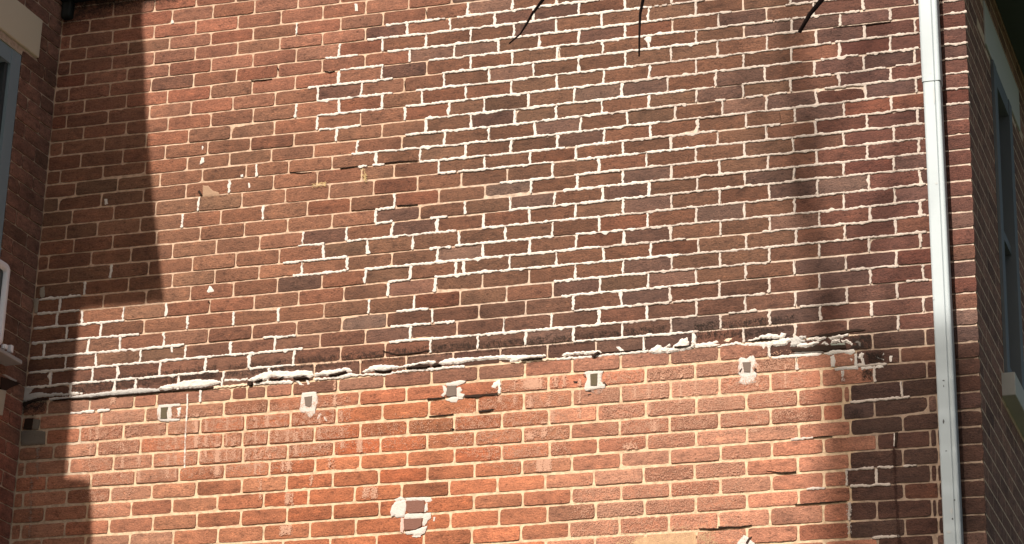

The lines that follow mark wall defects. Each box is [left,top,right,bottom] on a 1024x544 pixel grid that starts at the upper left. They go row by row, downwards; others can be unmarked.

crack [810,329,865,347]
crack [374,350,441,372]
crack [592,349,642,357]
crack [248,371,347,386]
crack [23,387,214,407]